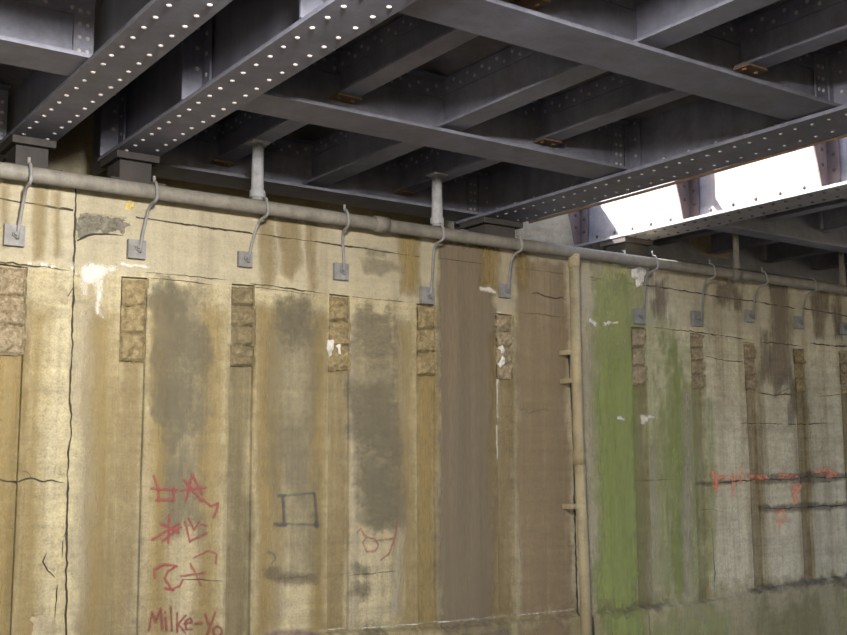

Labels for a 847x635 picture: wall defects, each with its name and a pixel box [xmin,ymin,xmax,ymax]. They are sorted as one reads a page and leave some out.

spalling [76,213,131,241]
crack [136,216,483,264]
damp [656,281,666,314]
damp [811,291,841,336]
crack [654,327,847,347]
crack [0,189,77,635]
crack [740,419,825,427]
damp [157,284,316,635]
damp [617,385,656,604]